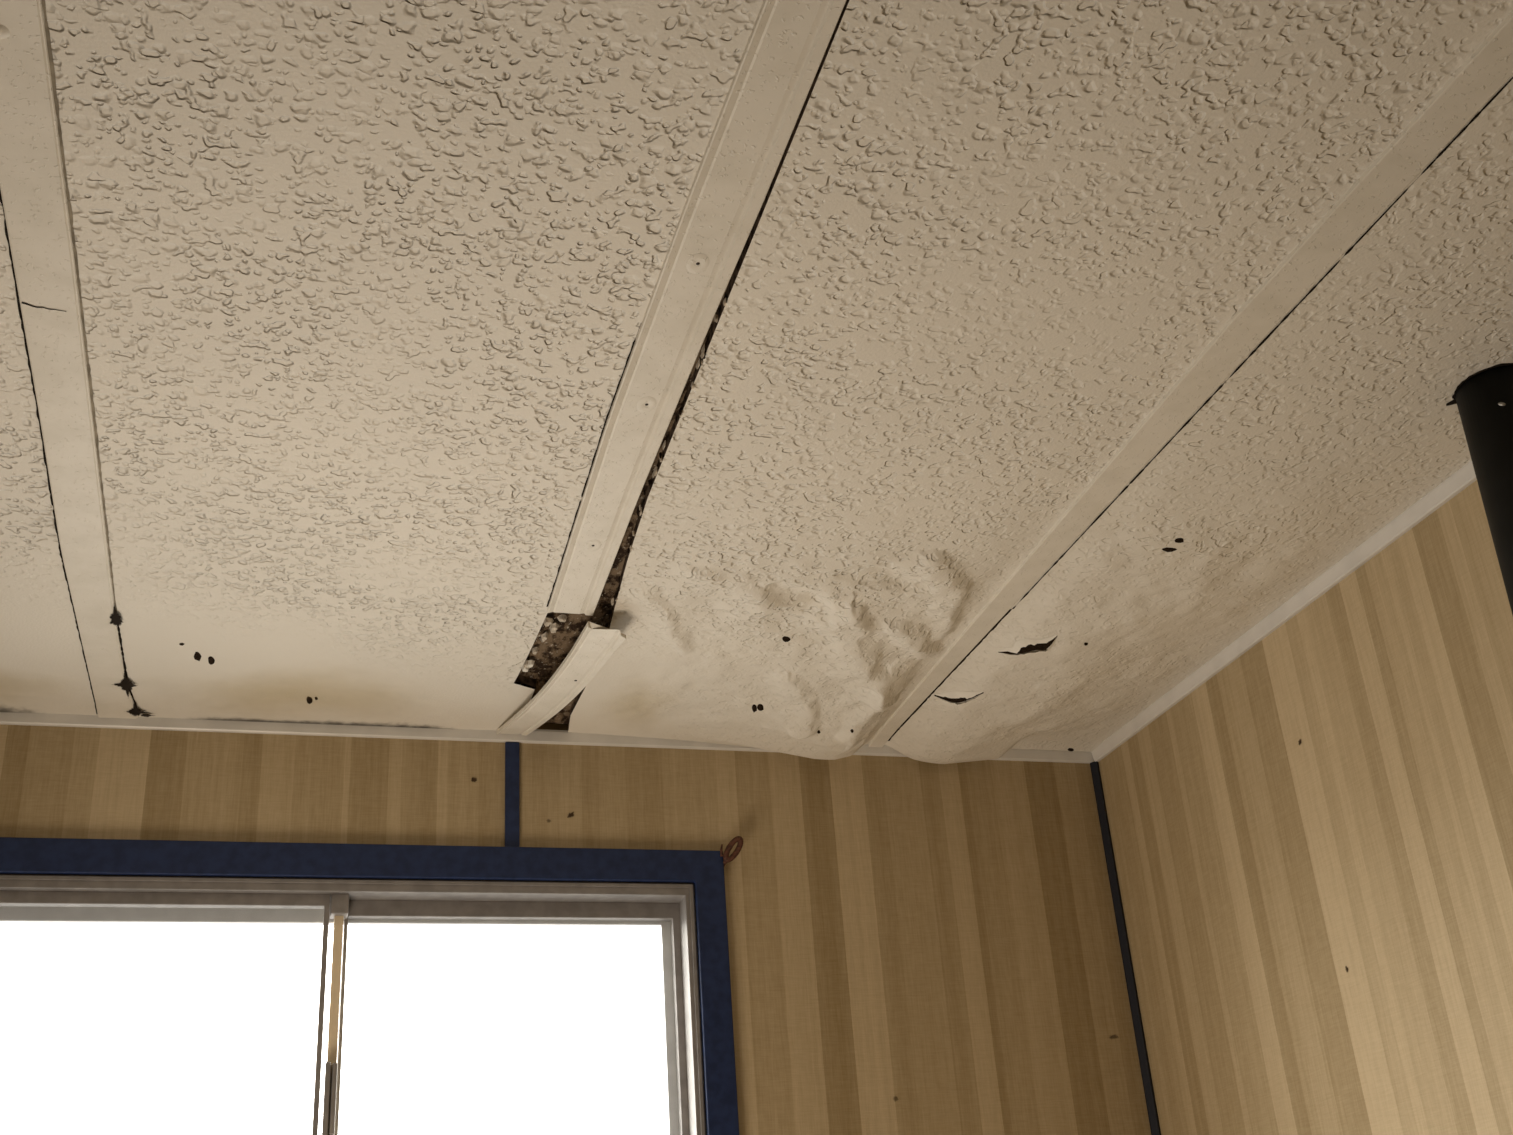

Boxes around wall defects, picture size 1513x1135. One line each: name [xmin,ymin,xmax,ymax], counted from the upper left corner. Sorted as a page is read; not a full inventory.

water stain [110,606,123,626]
crack [998,635,1057,655]
water stain [112,671,154,717]
crack [934,691,983,705]